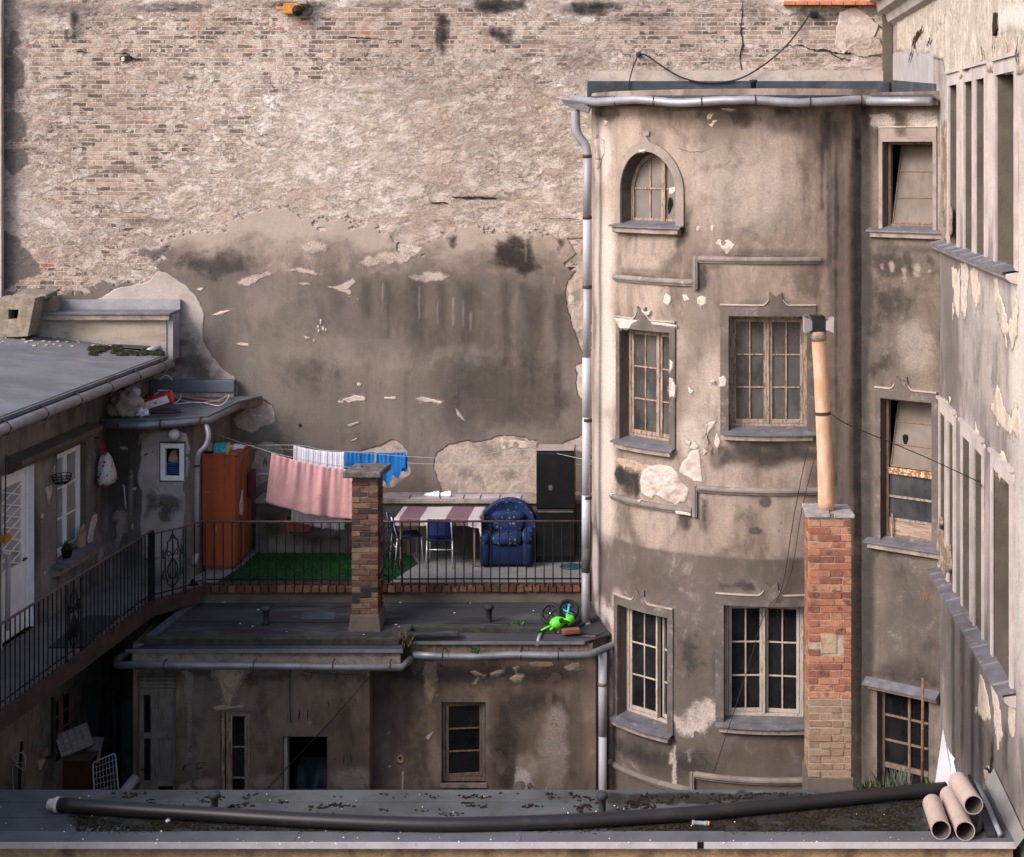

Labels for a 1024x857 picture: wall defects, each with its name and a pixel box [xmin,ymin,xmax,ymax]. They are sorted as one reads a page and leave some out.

crack [738,0,746,70]
crack [788,44,882,61]
spalling [4,0,882,398]
peeling [951,262,980,320]
peeling [994,278,1018,351]
peeling [990,385,1021,442]
spalling [434,435,537,492]
spalling [617,457,651,472]
spalling [470,661,581,684]
peeling [975,672,1016,751]